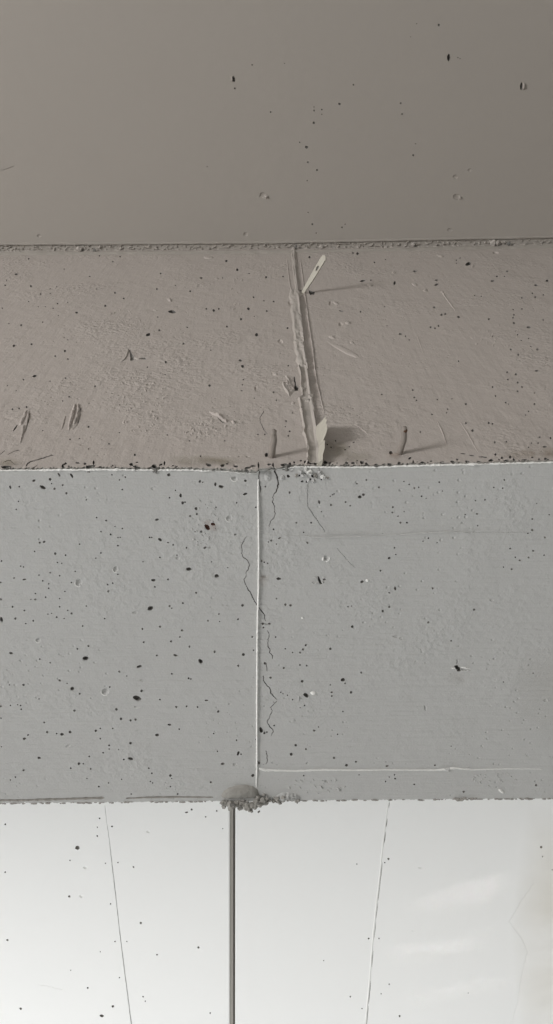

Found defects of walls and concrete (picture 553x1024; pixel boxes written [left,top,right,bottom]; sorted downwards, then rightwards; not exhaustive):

crack [258,470,279,525]
crack [241,536,277,764]